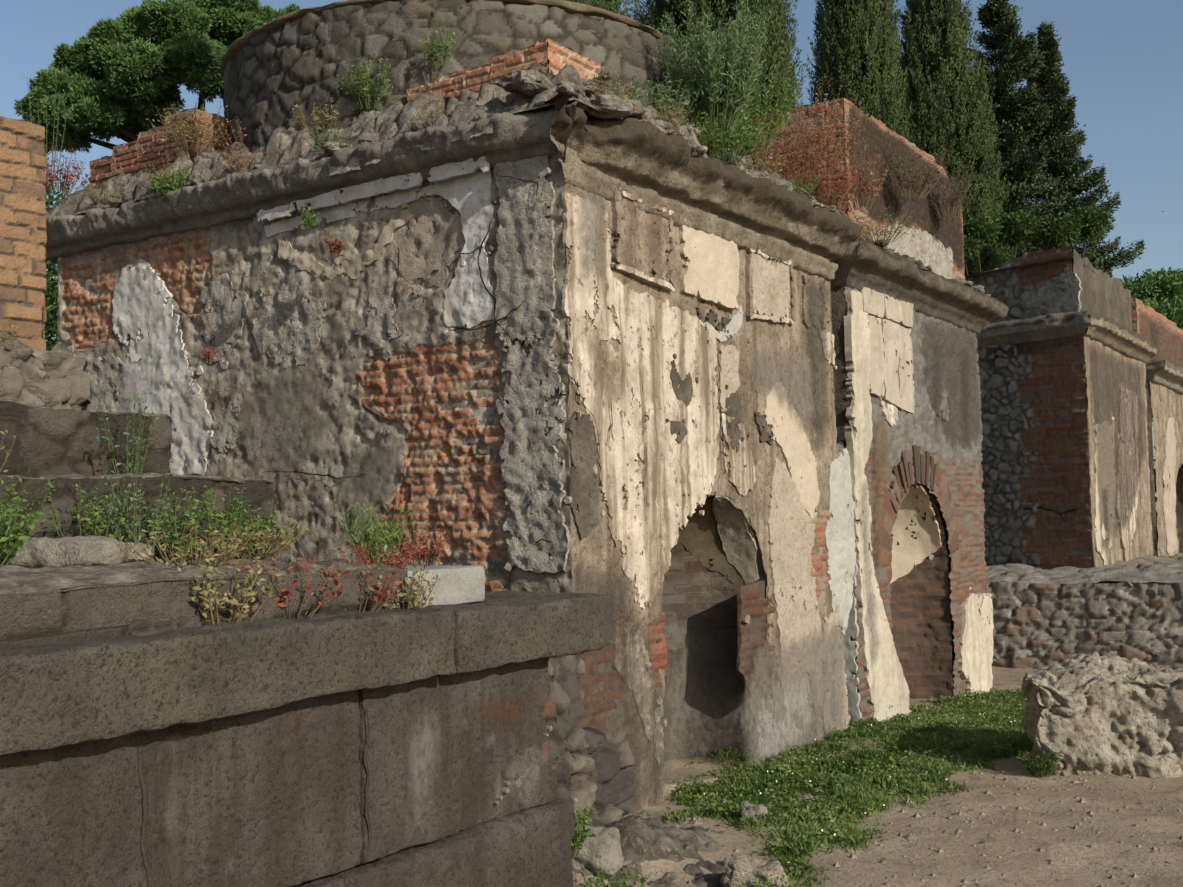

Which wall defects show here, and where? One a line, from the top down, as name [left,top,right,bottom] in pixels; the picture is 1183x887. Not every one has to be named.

flaking render [451,118,494,142]
leakage [754,288,827,433]
flaking render [58,143,953,765]
flaking render [957,587,994,693]